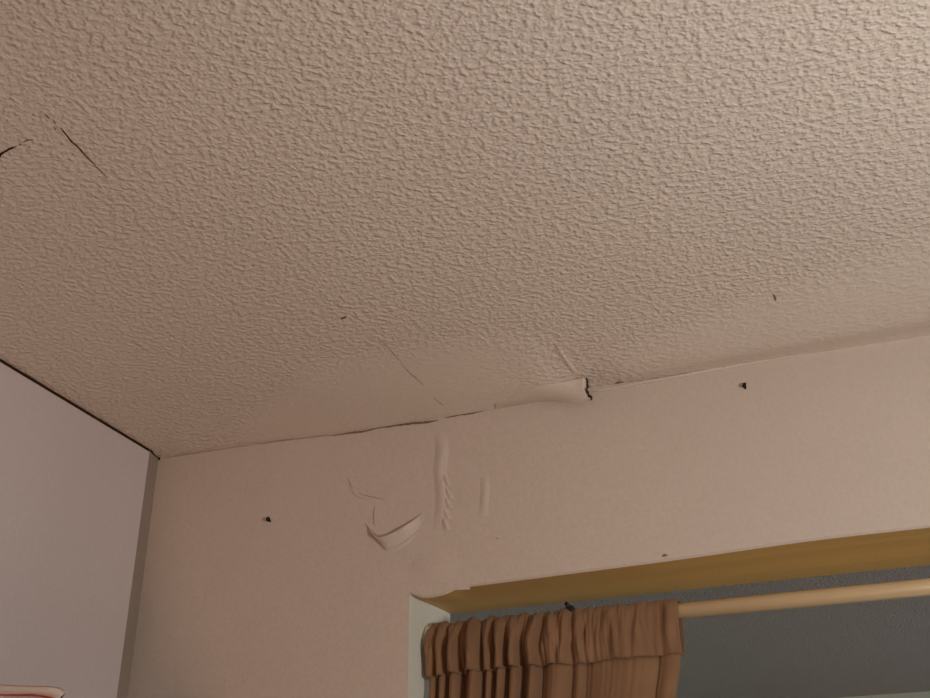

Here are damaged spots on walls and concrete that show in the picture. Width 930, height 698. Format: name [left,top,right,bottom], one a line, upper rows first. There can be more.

crack [0,139,34,157]
crack [41,110,108,178]
crack [165,341,482,458]